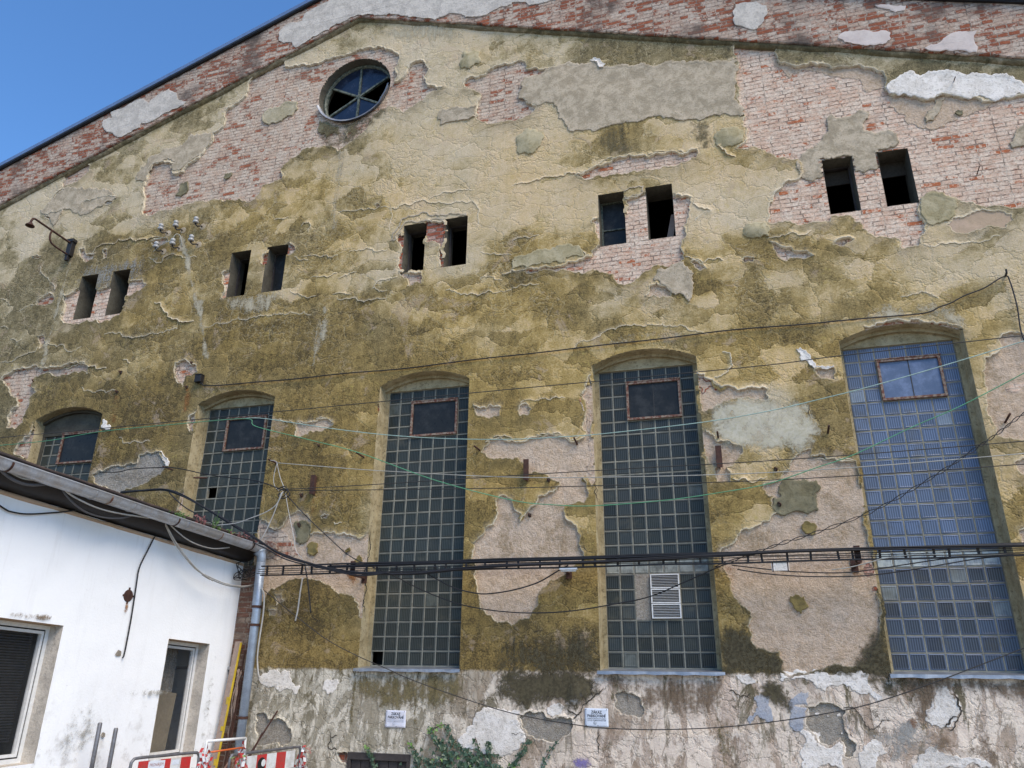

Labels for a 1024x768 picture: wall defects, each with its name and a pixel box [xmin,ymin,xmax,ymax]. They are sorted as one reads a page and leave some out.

spalling [140,45,444,217]
spalling [717,45,1024,264]
spalling [446,192,724,299]
spalling [0,325,116,459]
spalling [91,419,169,493]
spalling [470,373,595,628]
spalling [701,429,887,768]
peeling [259,669,301,694]
peeling [458,699,577,757]
damp [496,631,600,714]
peeling [925,686,962,728]
peeling [913,747,992,768]